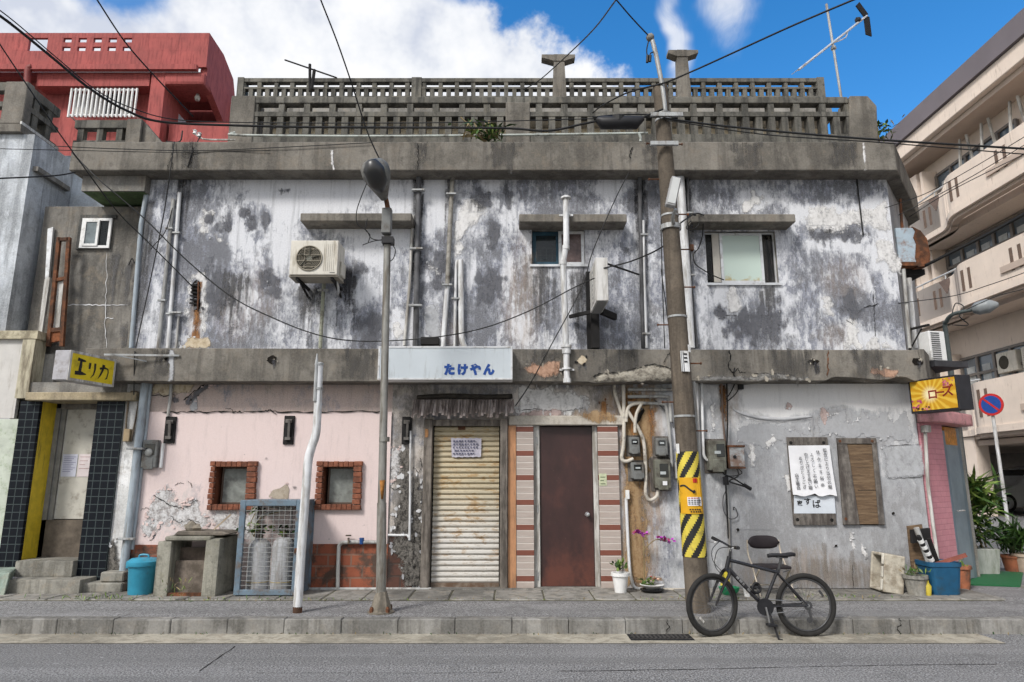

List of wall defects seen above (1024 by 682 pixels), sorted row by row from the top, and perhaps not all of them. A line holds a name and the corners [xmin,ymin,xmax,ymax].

rust [192,310,200,339]
leakage [222,267,251,334]
leakage [336,267,357,332]
leakage [533,267,556,327]
leakage [759,286,780,313]
crack [162,407,380,415]
peeling [514,361,590,416]
spalling [575,355,671,384]
spalling [871,365,899,377]
peeling [141,481,252,541]
peeling [389,444,423,587]
rust [583,391,656,586]